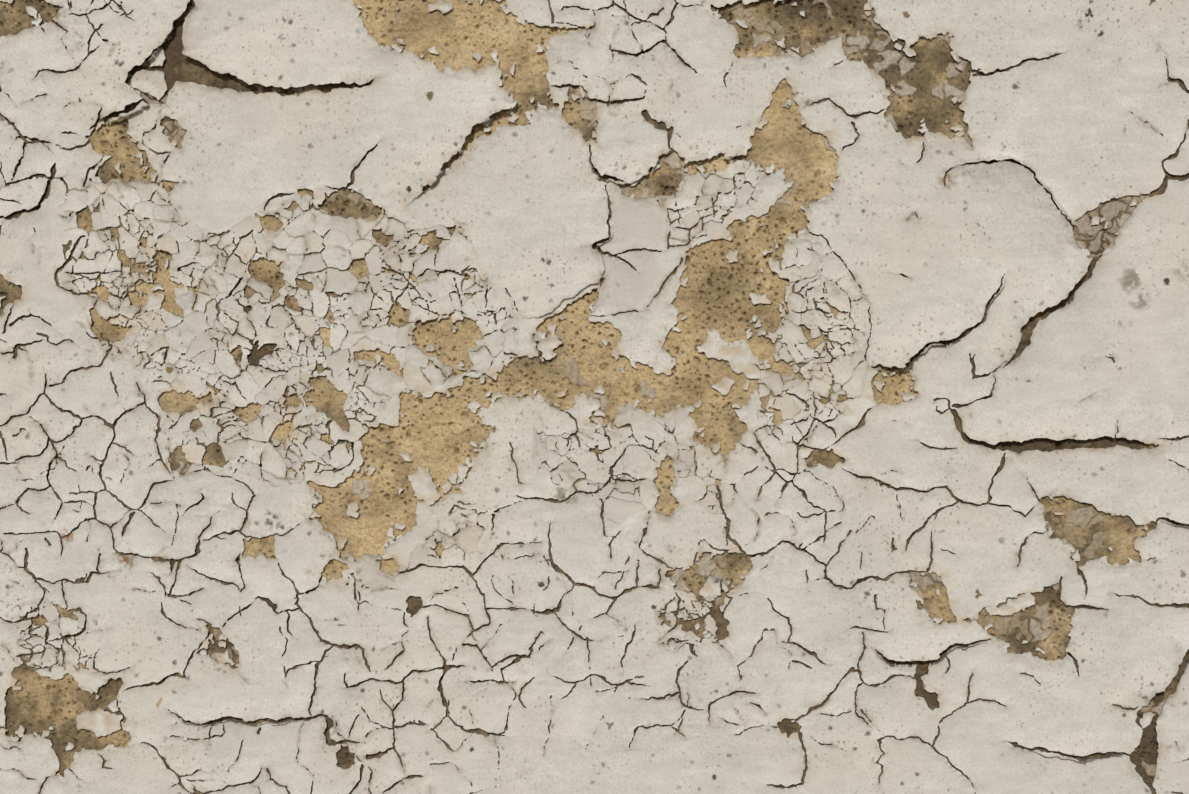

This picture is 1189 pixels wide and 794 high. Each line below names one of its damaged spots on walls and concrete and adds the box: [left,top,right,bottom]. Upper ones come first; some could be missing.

crack [548,0,768,317]
peeling [710,0,987,147]
crack [902,142,1072,225]
crack [1131,59,1189,197]
peeling [64,0,845,585]
peeling [856,158,1150,405]
crack [933,255,1102,414]
crack [0,86,1041,794]
peeling [958,380,1173,446]
peeling [862,571,1076,710]
peeling [5,661,131,777]
crack [1008,741,1129,762]